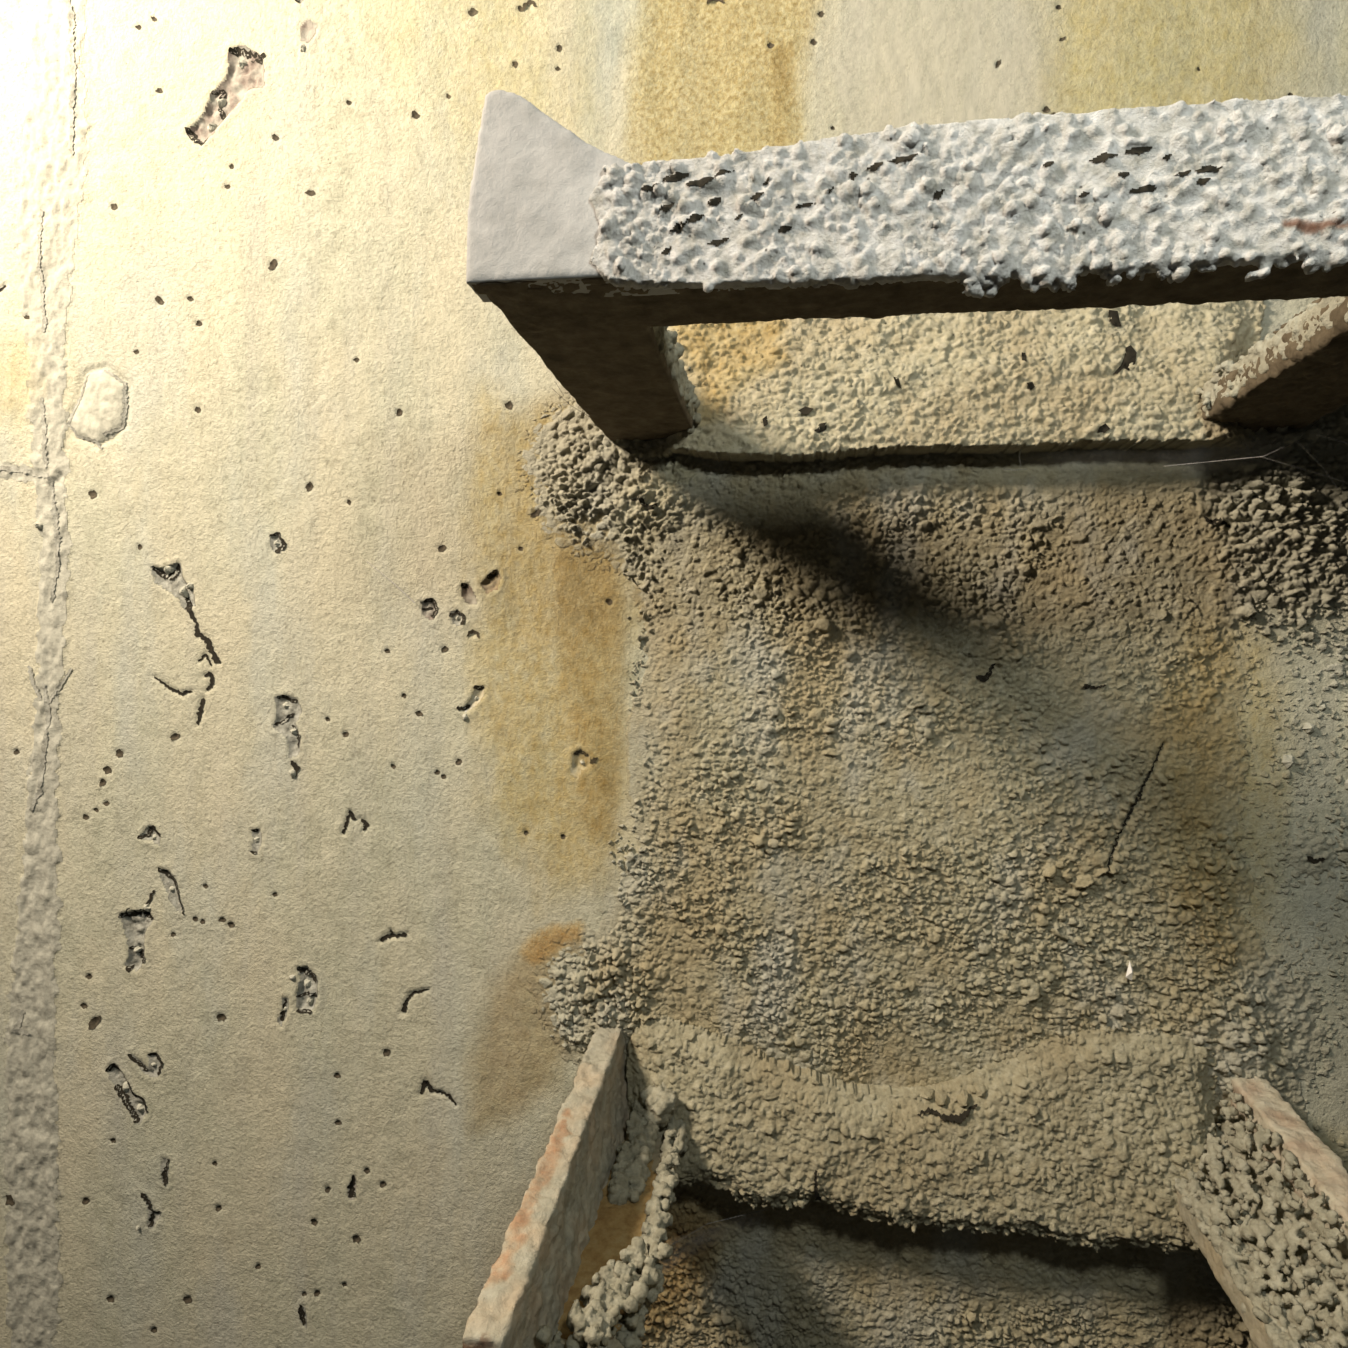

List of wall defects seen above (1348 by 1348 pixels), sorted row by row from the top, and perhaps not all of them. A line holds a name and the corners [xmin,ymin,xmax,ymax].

spalling [300,20,317,52]
spalling [184,45,265,145]
leakage [589,93,1348,299]
crack [154,597,221,725]
spalling [273,695,302,778]
crack [1107,743,1163,872]
spalling [118,867,185,973]
spalling [105,1052,163,1124]